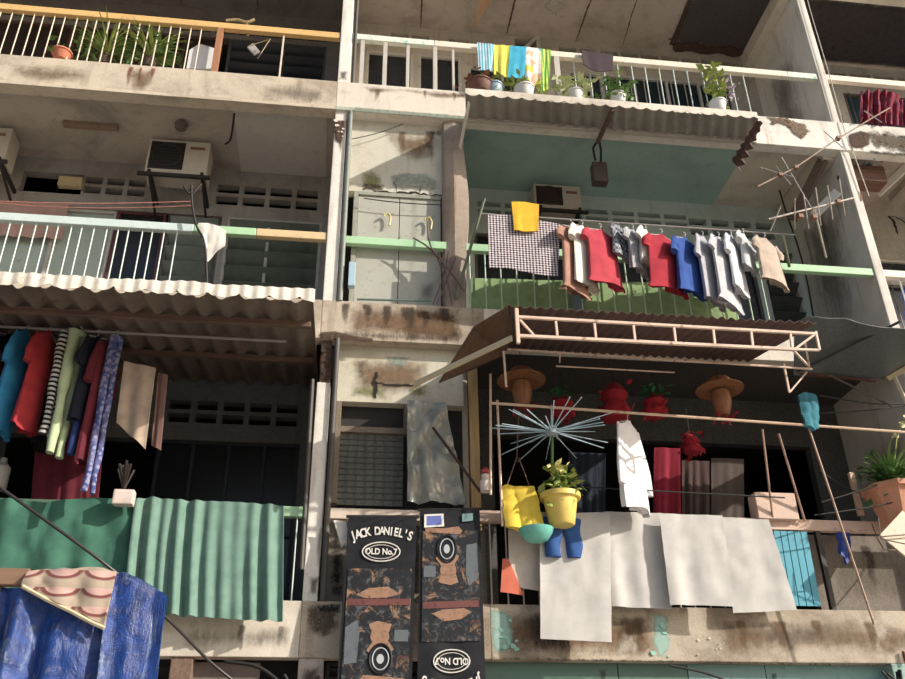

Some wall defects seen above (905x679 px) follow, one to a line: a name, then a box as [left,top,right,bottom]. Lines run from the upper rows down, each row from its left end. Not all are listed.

crack [576,0,592,41]
corrosion [128,67,155,88]
spalling [767,116,809,139]
water stain [399,132,439,156]
water stain [868,132,905,156]
crack [888,216,905,234]
water stain [351,304,458,340]
water stain [356,358,423,395]
crack [372,372,420,398]
water stain [730,621,786,645]
water stain [804,621,905,651]